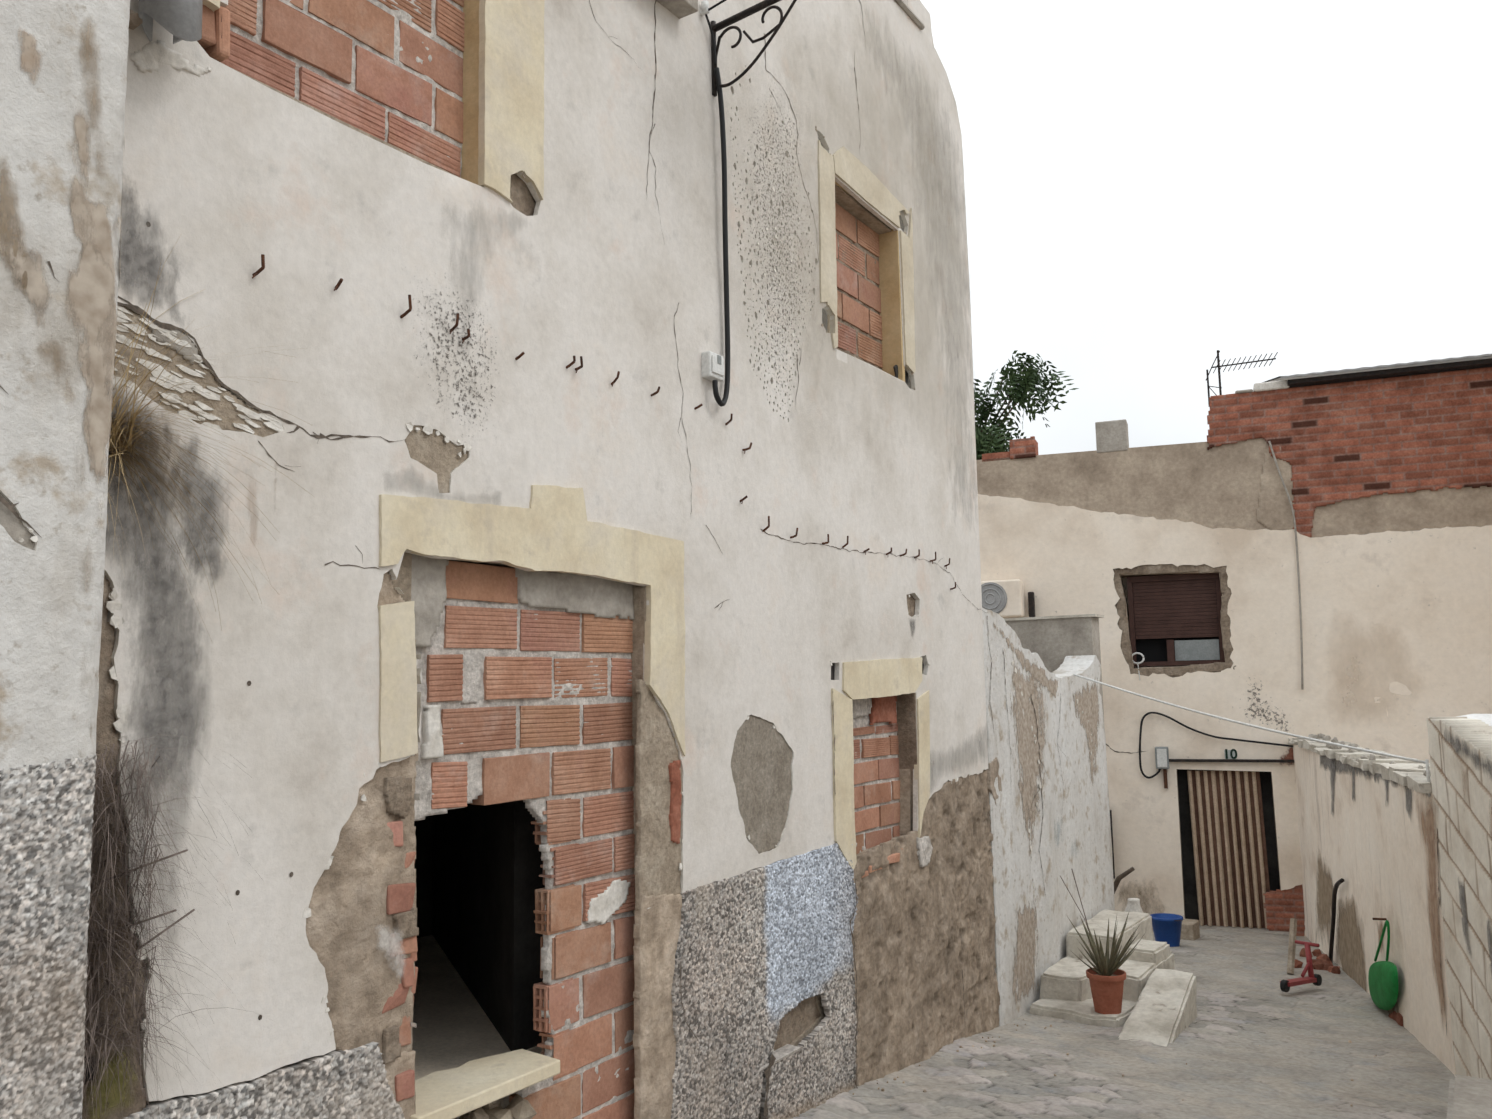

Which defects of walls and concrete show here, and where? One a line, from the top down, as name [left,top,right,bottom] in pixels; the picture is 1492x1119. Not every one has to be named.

leakage [0,170,28,292]
leakage [119,192,163,302]
leakage [106,391,219,808]
peeling [67,114,288,478]
crack [117,254,407,471]
peeling [405,422,472,493]
leakage [414,276,498,445]
leakage [743,88,812,395]
peeling [82,574,153,1119]
spalling [303,753,419,1119]
spalling [731,715,792,854]
spalling [852,624,1099,1086]